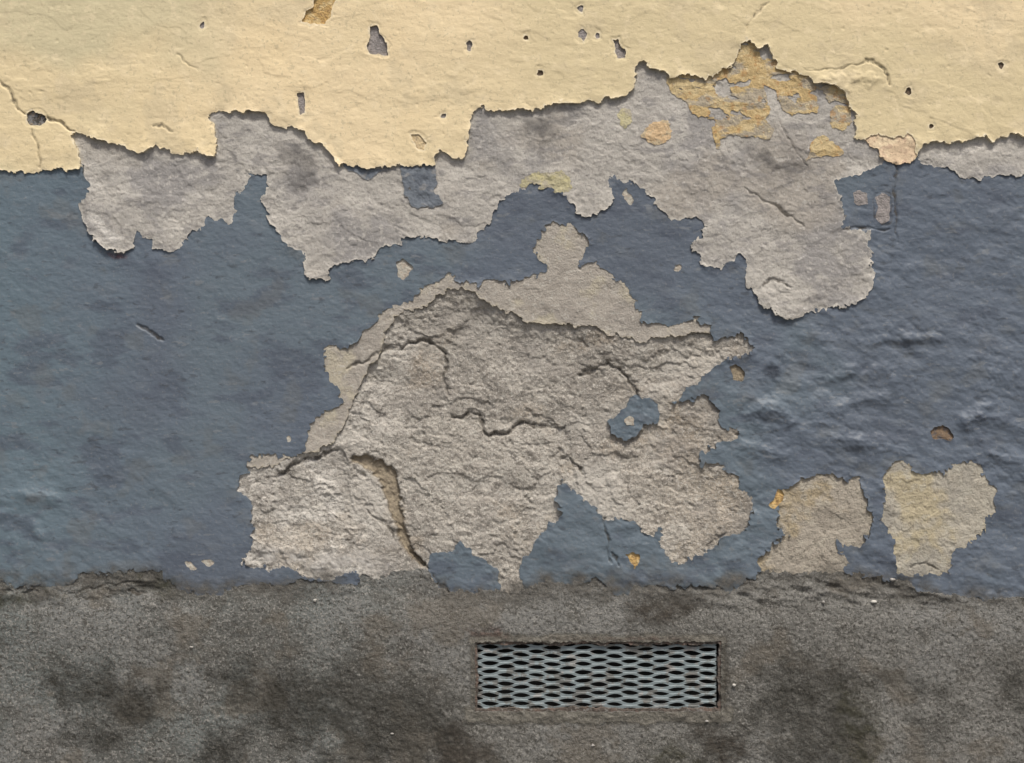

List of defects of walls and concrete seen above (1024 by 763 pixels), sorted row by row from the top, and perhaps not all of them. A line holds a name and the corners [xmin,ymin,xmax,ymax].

spalling [72,39,1024,595]
crack [454,413,543,436]
damp [266,679,493,763]
damp [772,671,861,763]